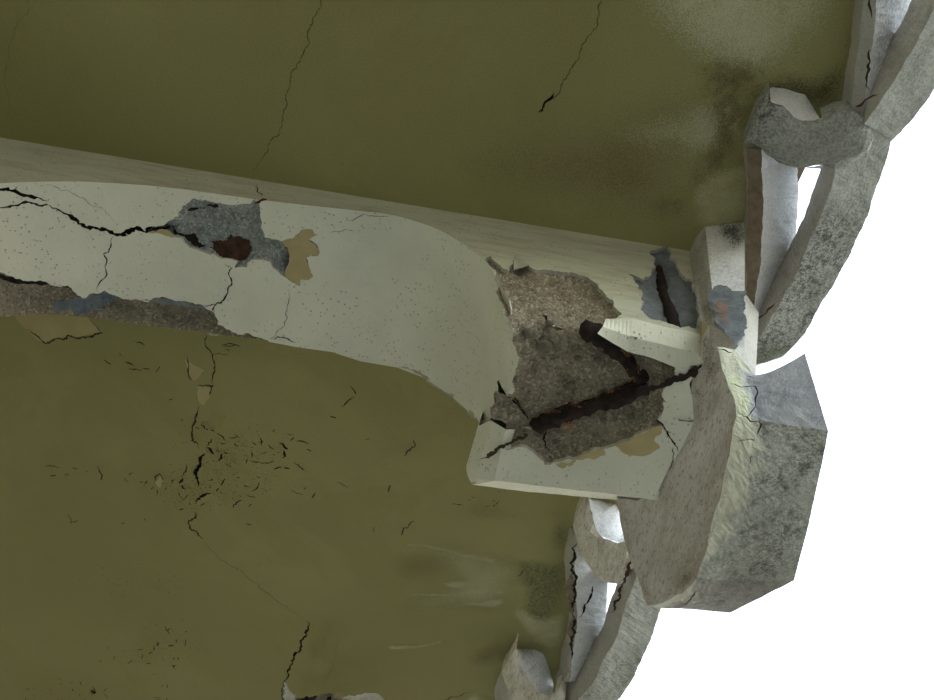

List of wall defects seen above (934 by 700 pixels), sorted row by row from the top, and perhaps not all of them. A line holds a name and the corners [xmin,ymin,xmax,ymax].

crack [252,0,322,204]
crack [538,0,602,113]
crack [0,184,170,290]
spalling [0,272,265,351]
spalling [148,198,319,286]
spalling [486,254,675,469]
spalling [633,250,698,329]
spalling [708,285,747,347]
crack [191,407,204,486]
crack [188,513,310,700]
crack [569,543,631,659]
spalling [283,682,384,700]